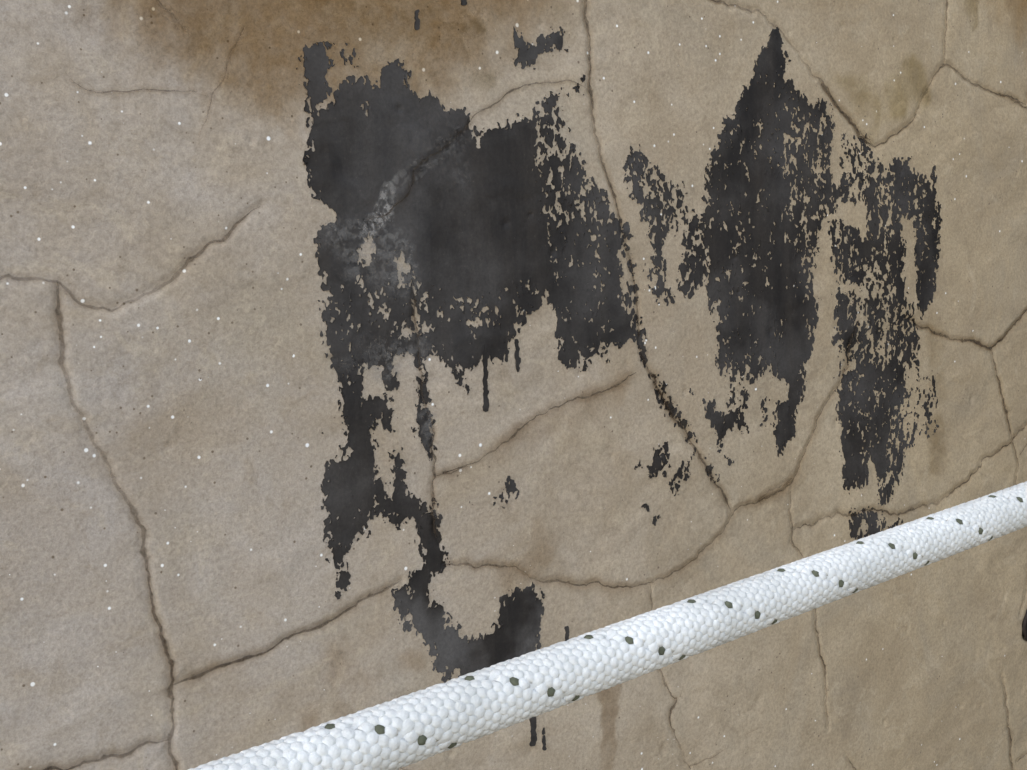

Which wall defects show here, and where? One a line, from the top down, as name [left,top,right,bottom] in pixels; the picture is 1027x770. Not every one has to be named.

crack [584,5,594,120]
crack [821,84,912,147]
crack [603,165,620,218]
crack [186,213,249,265]
crack [55,291,63,337]
peeling [296,26,942,683]
crack [913,309,1027,459]
crack [511,368,753,505]
crack [430,445,458,535]
crack [140,526,384,720]
crack [44,761,86,770]